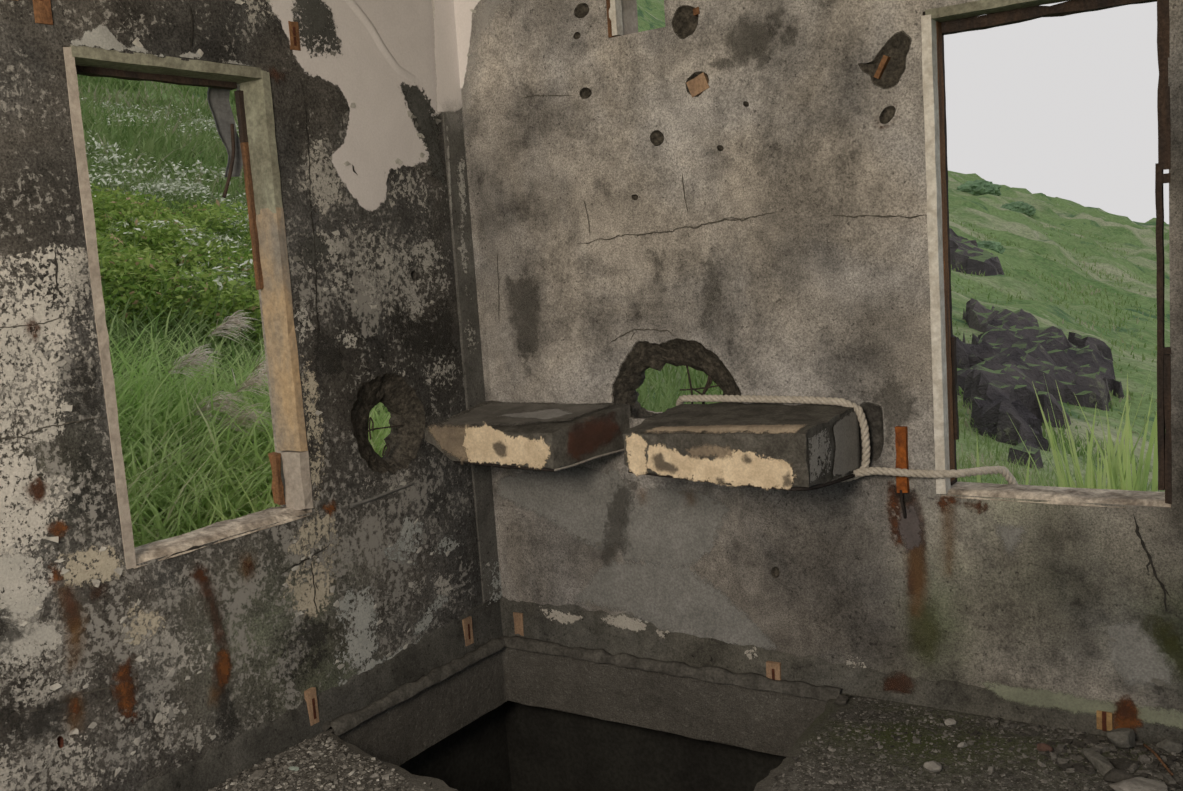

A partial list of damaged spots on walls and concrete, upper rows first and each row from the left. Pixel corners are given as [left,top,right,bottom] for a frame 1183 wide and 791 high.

spalling [858,31,912,89]
peeling [235,0,480,324]
crack [579,174,774,244]
crack [831,213,922,221]
peeling [0,243,124,708]
peeling [280,299,460,686]
flaking render [462,338,832,649]
corrosion [887,482,926,610]
corrosion [937,496,988,520]
crack [1133,514,1170,613]
corrosion [193,567,232,696]
corrosion [1112,699,1142,729]